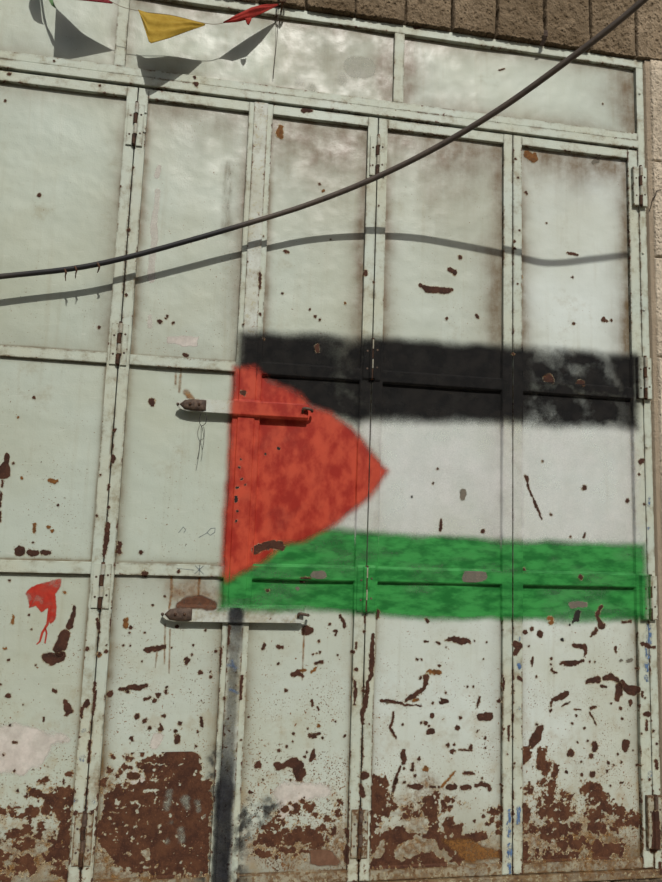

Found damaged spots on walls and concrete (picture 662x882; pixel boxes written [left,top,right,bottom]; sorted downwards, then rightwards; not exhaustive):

peeling [52,681,169,719]
peeling [0,717,69,775]
peeling [89,714,215,879]
peeling [0,770,78,882]
corrosion [291,836,345,866]
corrosion [443,839,500,862]